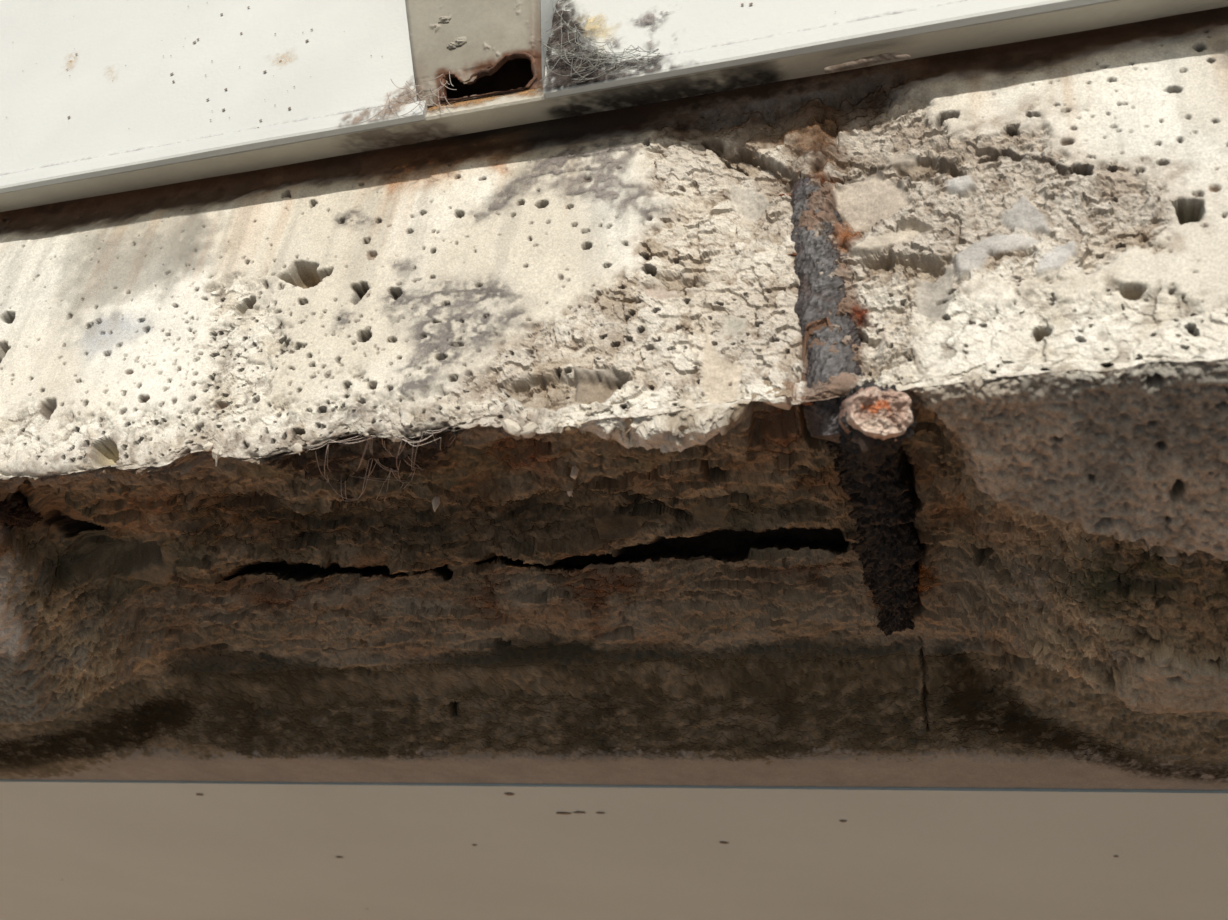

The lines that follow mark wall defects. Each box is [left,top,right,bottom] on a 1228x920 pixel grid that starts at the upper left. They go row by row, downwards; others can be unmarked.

rust [428,96,496,111]
rust [852,306,866,321]
spalling [0,74,1228,713]
crack [224,491,849,581]